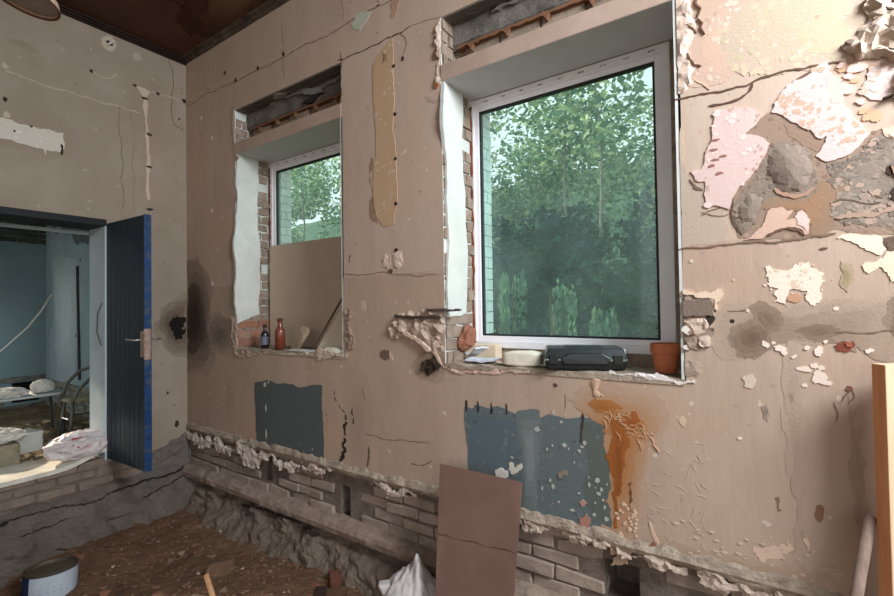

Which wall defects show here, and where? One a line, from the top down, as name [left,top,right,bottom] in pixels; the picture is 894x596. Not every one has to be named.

spalling [269,75,341,108]
crack [337,17,439,97]
rust [457,0,596,53]
crack [684,0,705,34]
crack [675,53,843,107]
peeling [676,0,894,282]
peeling [763,262,833,306]
crack [0,466,184,537]
spalling [152,422,439,507]
crack [334,388,432,467]
rust [568,381,671,565]
spalling [520,478,847,596]